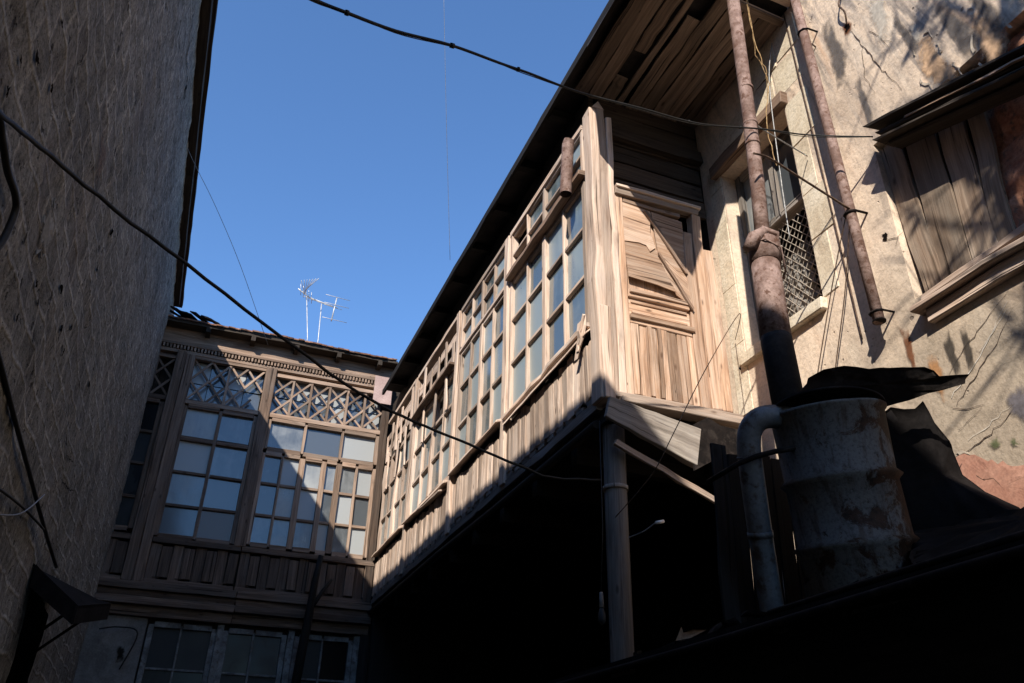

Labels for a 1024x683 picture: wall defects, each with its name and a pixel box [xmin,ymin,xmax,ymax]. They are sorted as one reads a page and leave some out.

crack [851,31,899,91]
corrosion [904,334,915,367]
corrosion [929,361,942,376]
crack [950,289,1012,457]
peeling [956,450,1024,509]